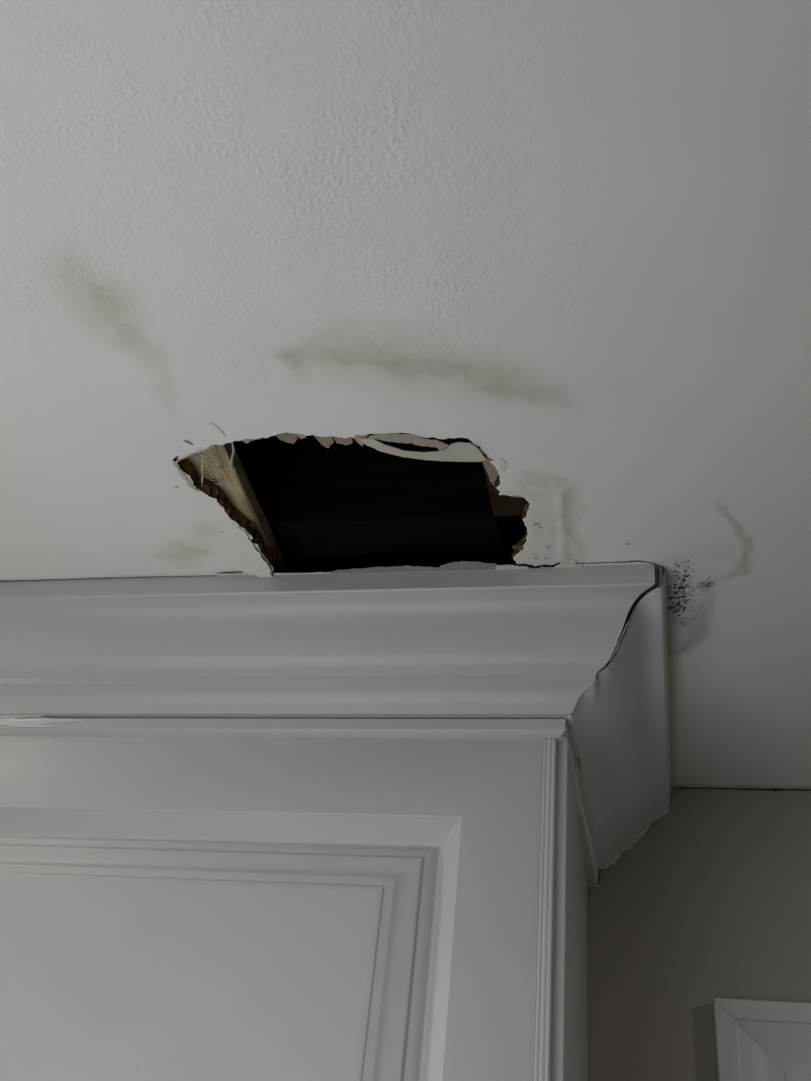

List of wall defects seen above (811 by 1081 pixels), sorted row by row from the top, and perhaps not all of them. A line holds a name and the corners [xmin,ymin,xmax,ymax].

peeling [275,433,449,452]
peeling [173,446,215,492]
peeling [482,457,498,488]
damp [667,559,712,625]